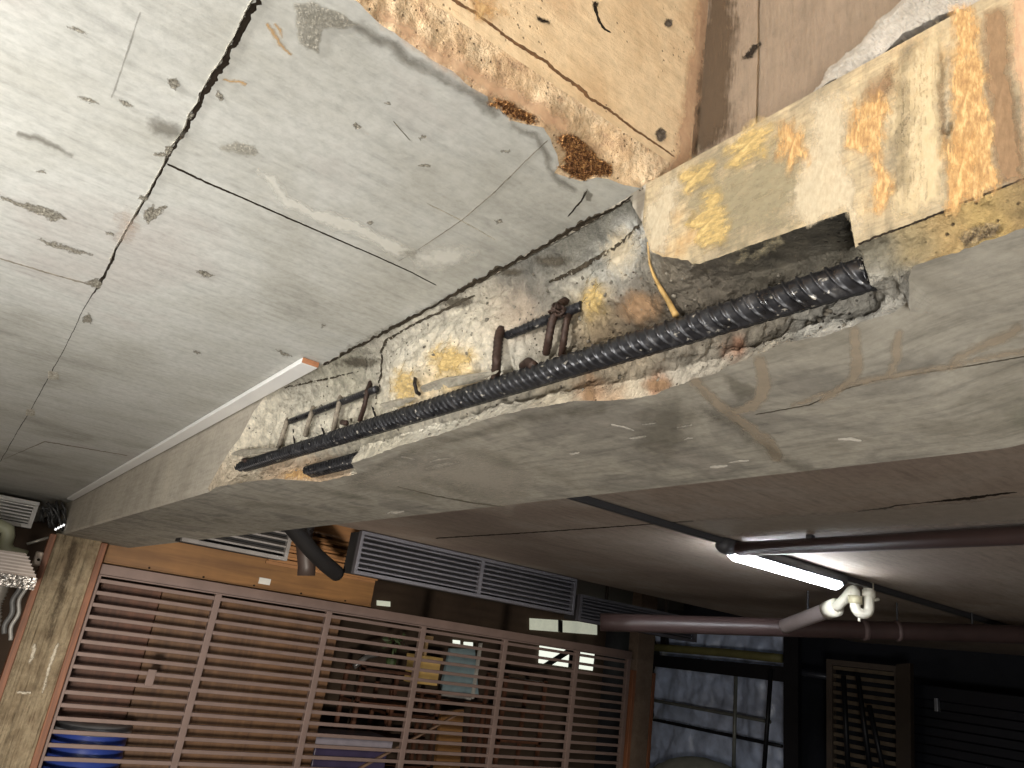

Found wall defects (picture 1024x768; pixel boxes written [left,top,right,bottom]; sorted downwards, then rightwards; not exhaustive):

crack [0,0,675,462]
leakage [691,0,738,154]
leakage [688,97,856,244]
leakage [886,32,944,215]
spalling [208,180,1024,492]
crack [858,492,1017,512]